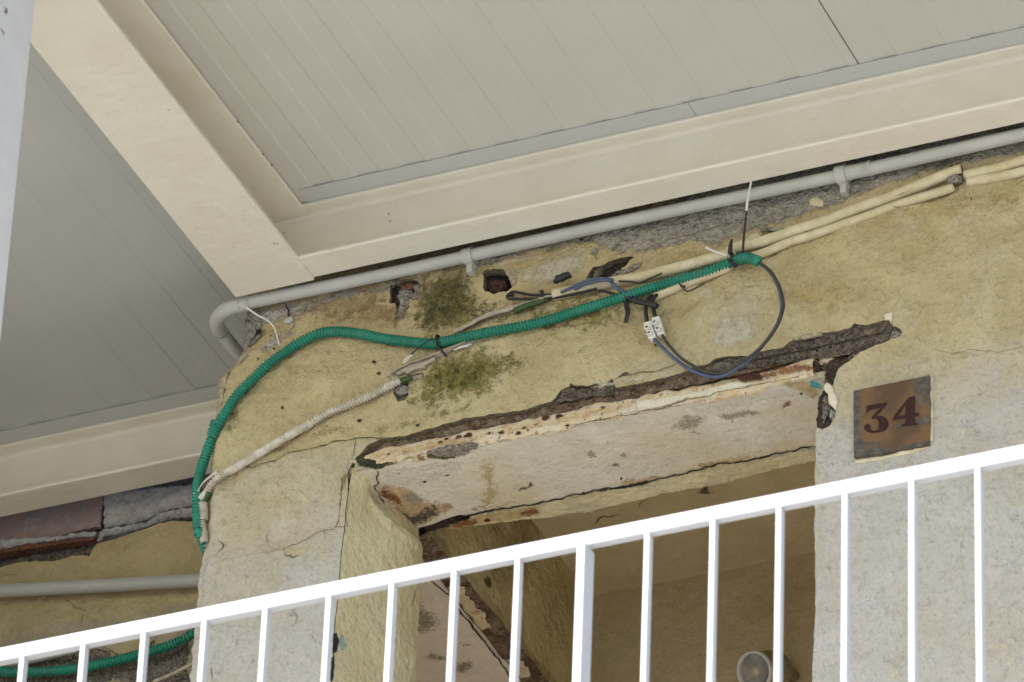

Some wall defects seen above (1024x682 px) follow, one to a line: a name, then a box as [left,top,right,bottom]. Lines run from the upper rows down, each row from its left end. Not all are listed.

flaking render [667,122,1024,205]
flaking render [477,141,1024,294]
flaking render [216,278,423,420]
spalling [555,377,643,404]
spalling [695,313,902,429]
crack [246,437,386,553]
rust [378,484,453,525]
spalling [426,442,479,460]
rust [371,402,630,461]
crack [466,446,816,524]
peeling [447,586,491,630]